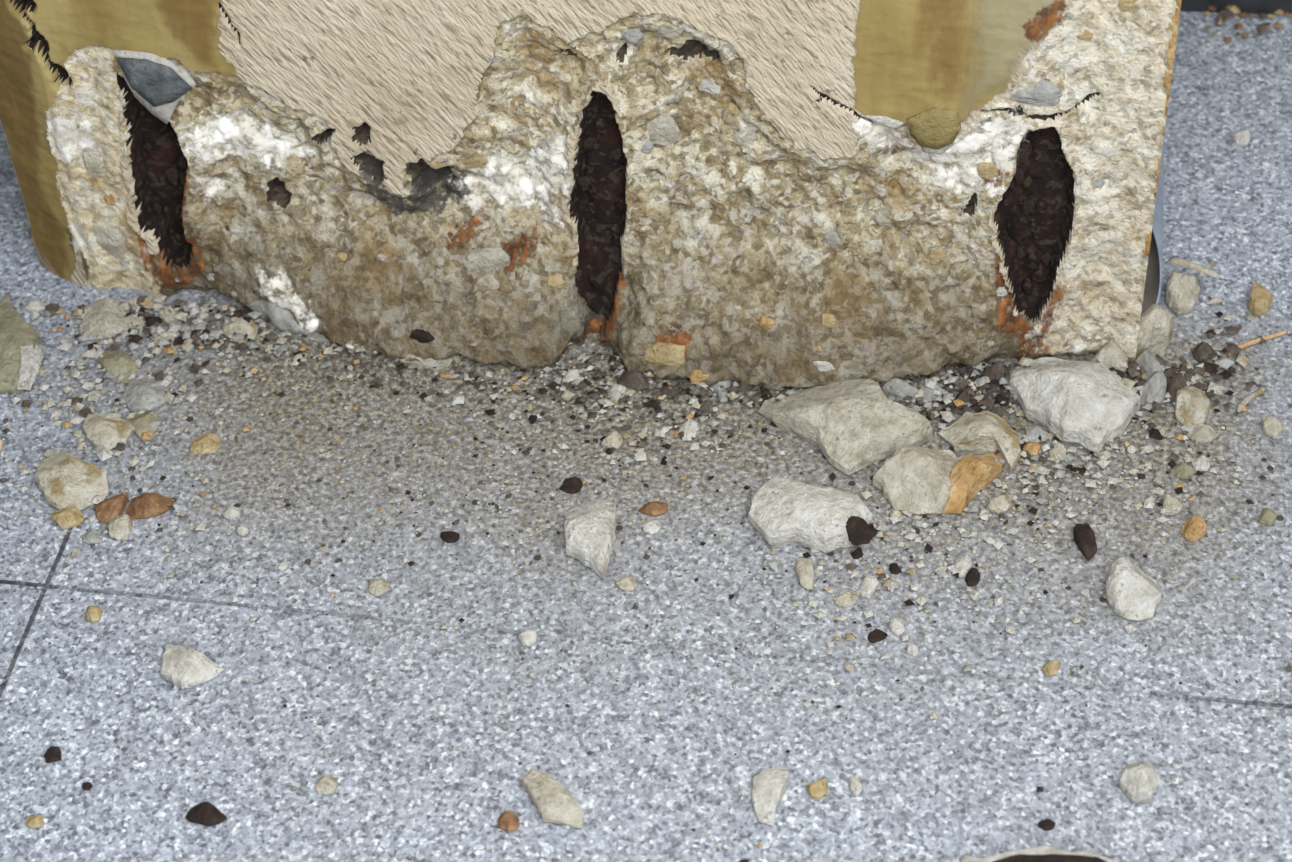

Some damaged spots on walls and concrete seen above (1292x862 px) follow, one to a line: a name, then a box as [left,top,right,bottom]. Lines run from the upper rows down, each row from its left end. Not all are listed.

rust [117,73,205,289]
rust [567,91,628,347]
spalling [45,0,1178,451]
crack [811,86,872,122]
damp [851,0,1060,199]
rust [983,127,1075,360]
rust [1023,0,1066,42]
crack [990,92,1100,121]
flaking render [34,451,133,544]
flaking render [190,433,221,455]